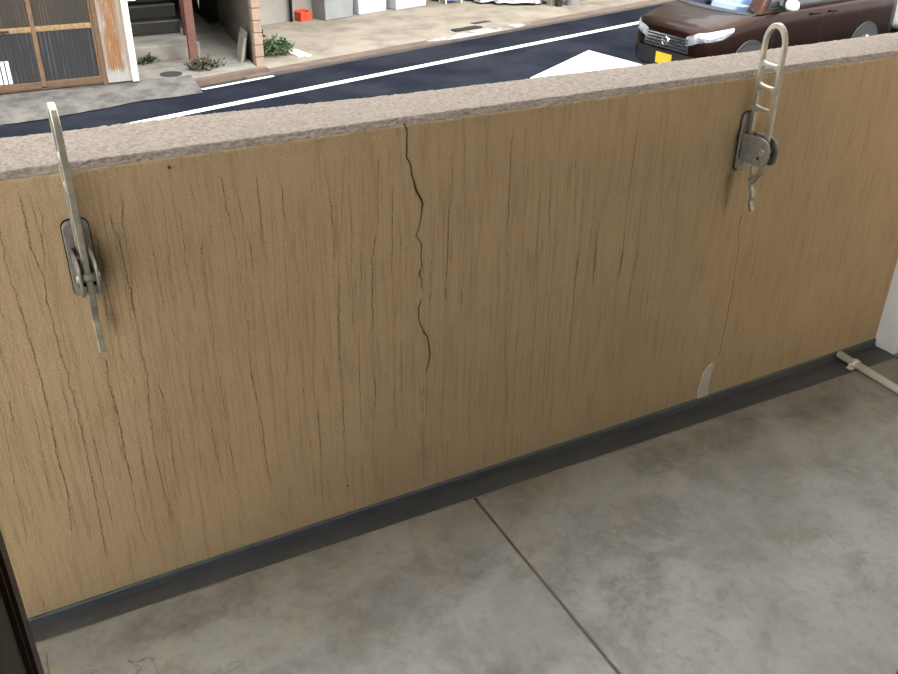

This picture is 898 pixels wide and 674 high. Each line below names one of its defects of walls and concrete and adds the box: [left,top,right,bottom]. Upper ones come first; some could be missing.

crack [404,125,430,373]